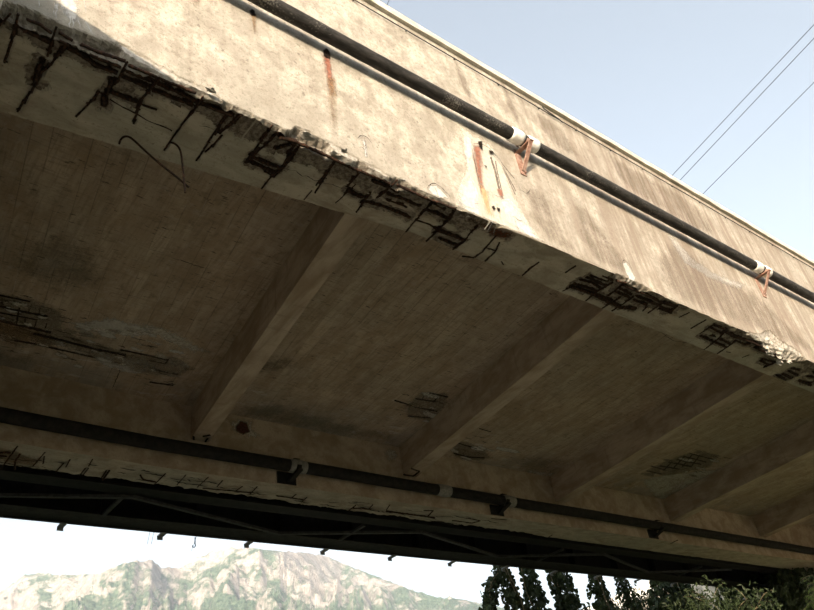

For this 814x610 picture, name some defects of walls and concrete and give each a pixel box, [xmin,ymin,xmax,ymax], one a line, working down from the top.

corrosion [323,48,335,97]
spalling [0,4,516,262]
corrosion [474,146,491,214]
spalling [563,265,690,318]
spalling [0,294,126,364]
spalling [691,319,814,387]
spalling [0,446,71,473]
spalling [79,459,265,498]